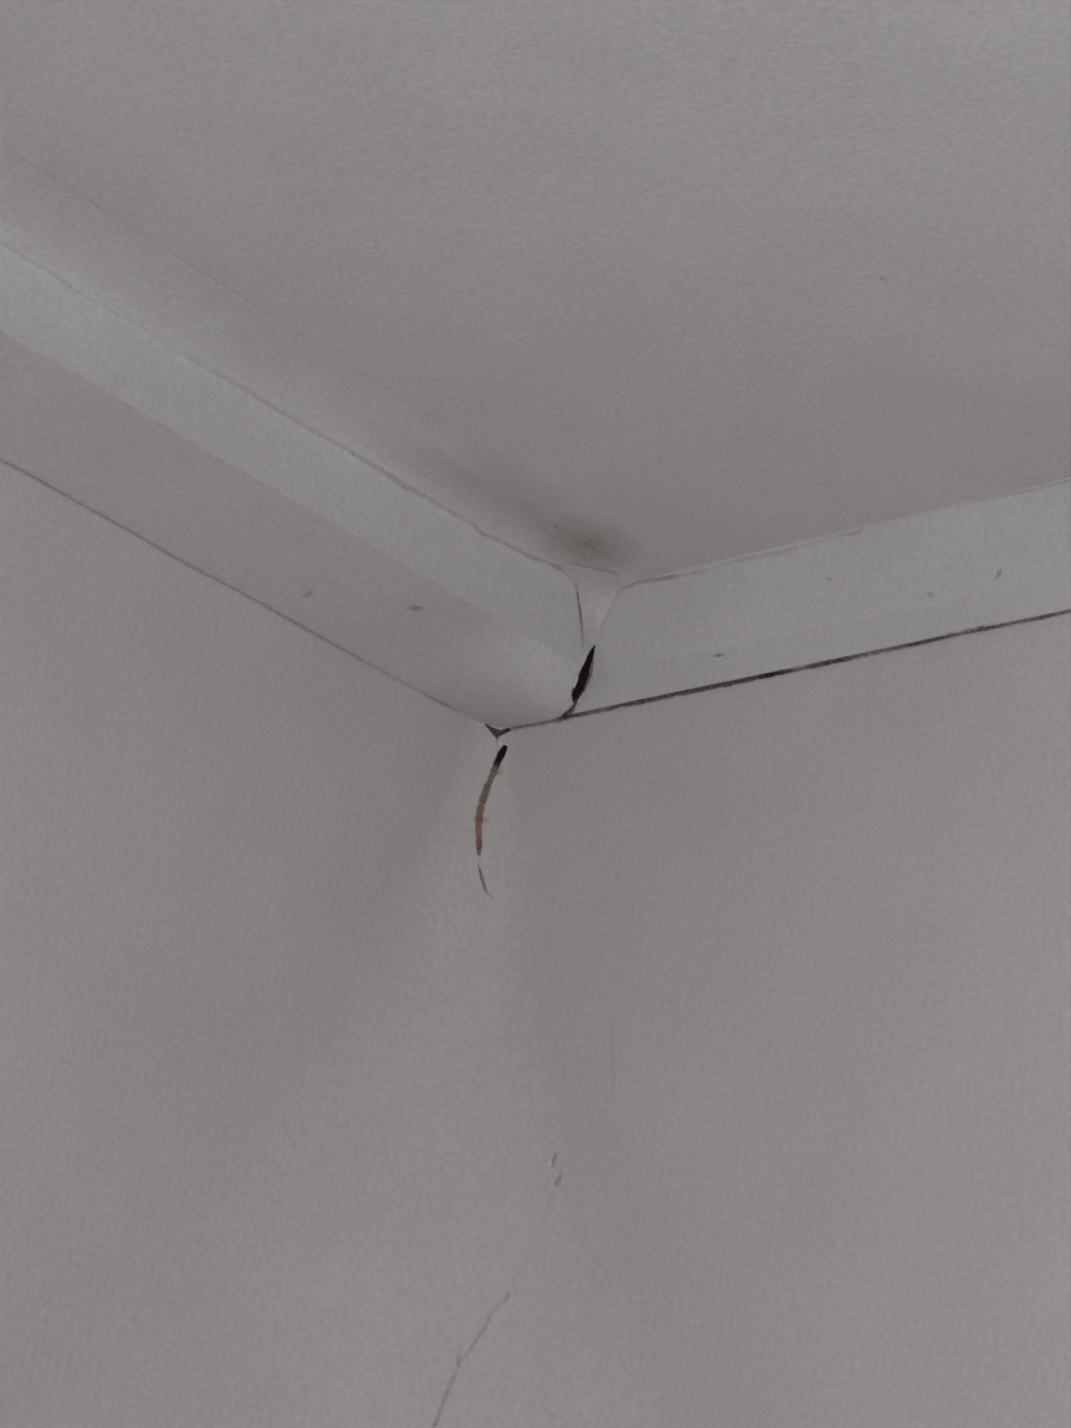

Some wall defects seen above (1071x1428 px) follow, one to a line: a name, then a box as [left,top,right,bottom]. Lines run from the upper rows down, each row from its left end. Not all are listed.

crack [475,610,1069,888]